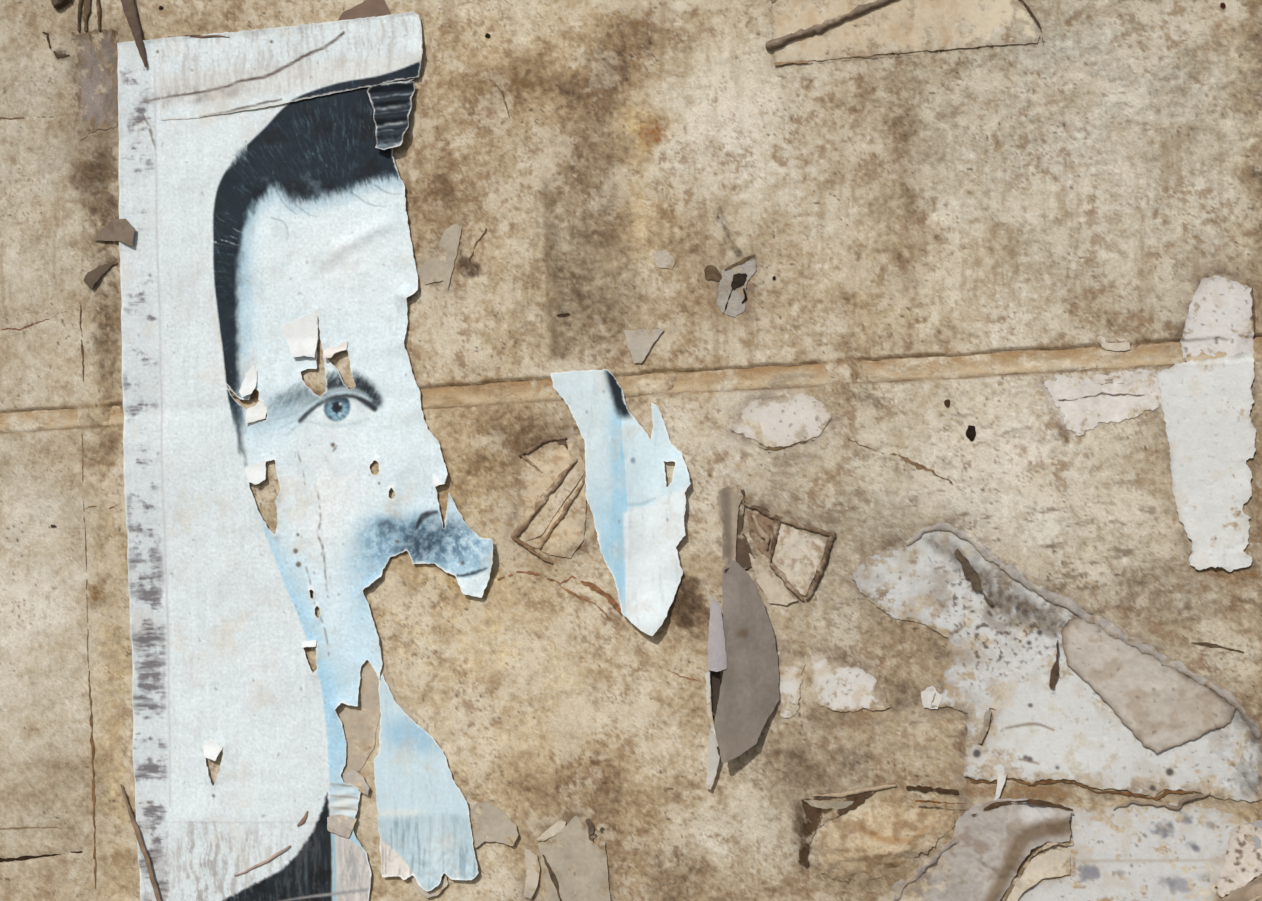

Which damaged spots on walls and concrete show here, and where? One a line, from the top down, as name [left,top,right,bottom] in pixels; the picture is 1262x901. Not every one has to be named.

peeling [731,392,831,450]
peeling [1042,272,1256,572]
crack [0,434,120,889]
peeling [777,522,1262,901]